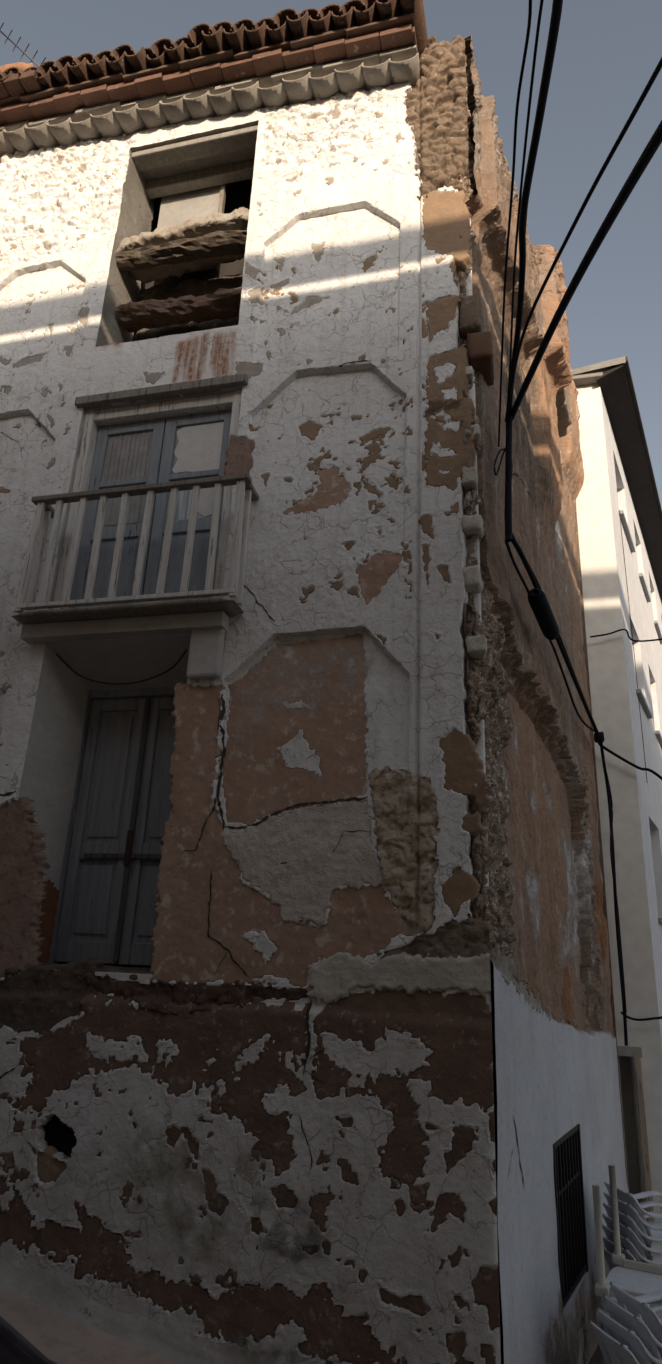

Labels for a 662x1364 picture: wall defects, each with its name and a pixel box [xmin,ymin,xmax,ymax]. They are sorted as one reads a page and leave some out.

peeling [0,146,121,262]
peeling [13,384,71,444]
peeling [0,284,96,404]
peeling [143,373,165,385]
peeling [150,35,581,1033]
crack [183,694,370,978]
peeling [0,797,502,1364]
crack [507,1116,525,1189]